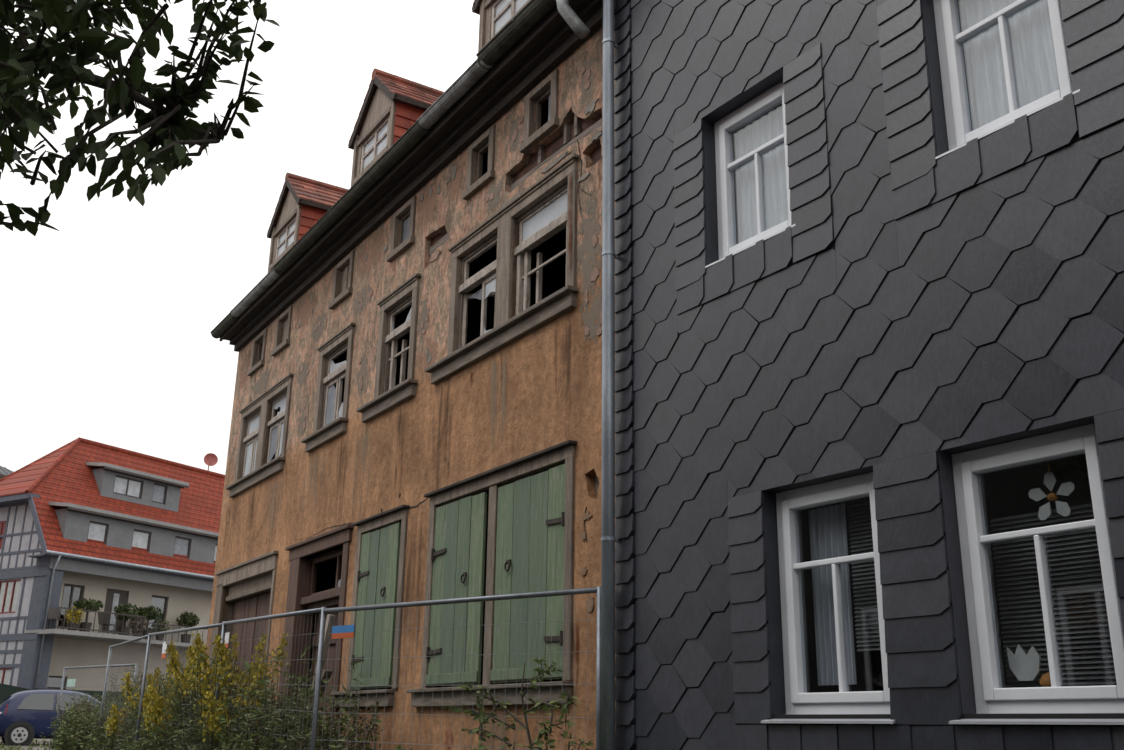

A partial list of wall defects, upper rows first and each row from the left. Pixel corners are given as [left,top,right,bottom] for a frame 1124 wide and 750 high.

spalling [484,50,602,215]